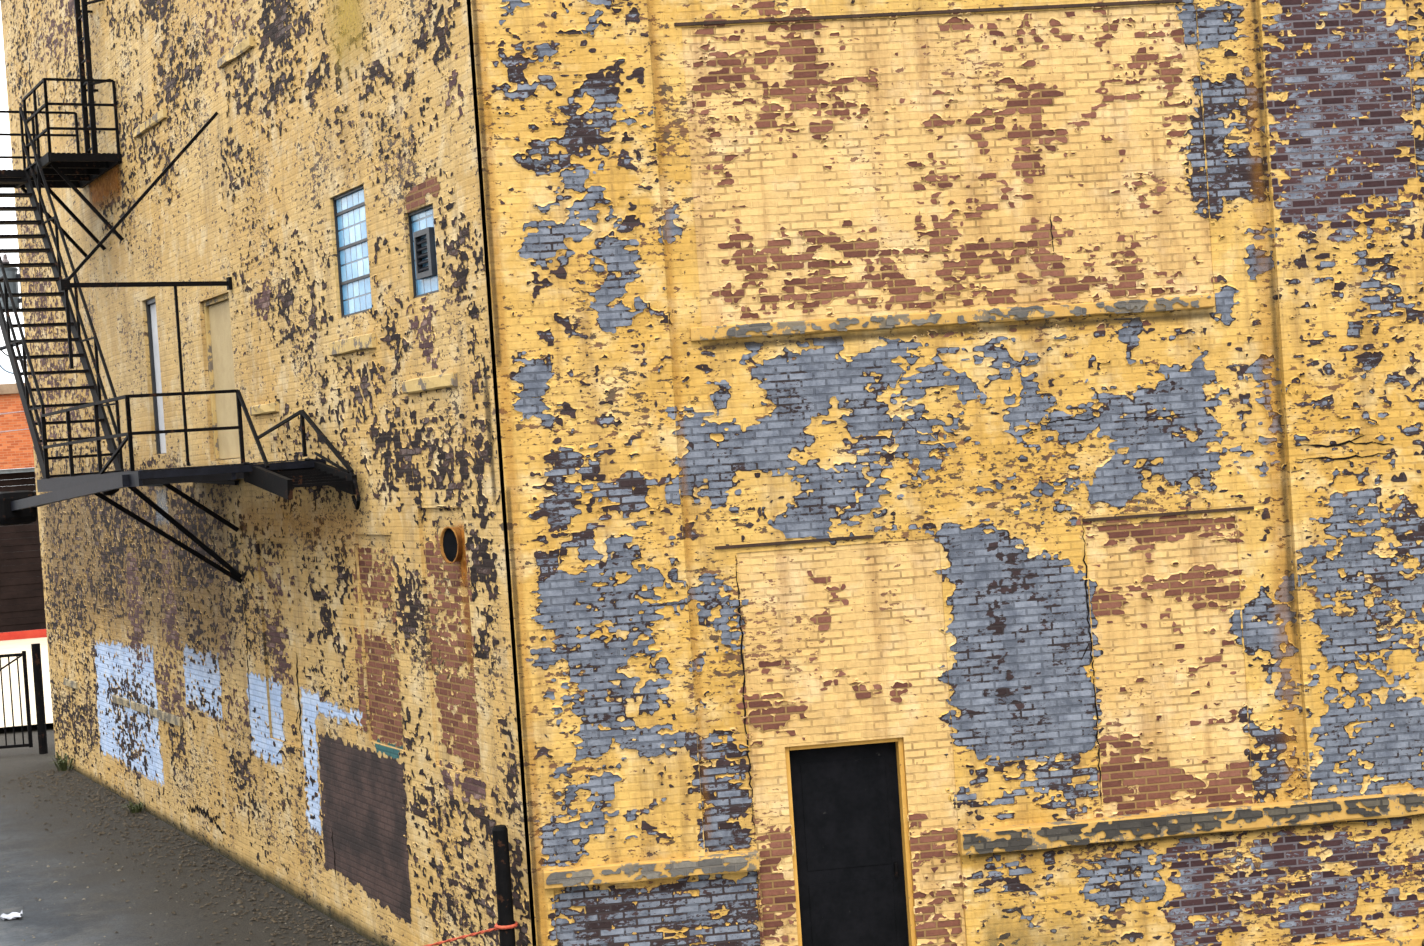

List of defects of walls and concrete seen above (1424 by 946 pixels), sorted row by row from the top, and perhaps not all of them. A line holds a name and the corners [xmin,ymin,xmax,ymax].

peeling [3,0,532,946]
peeling [483,0,1424,946]